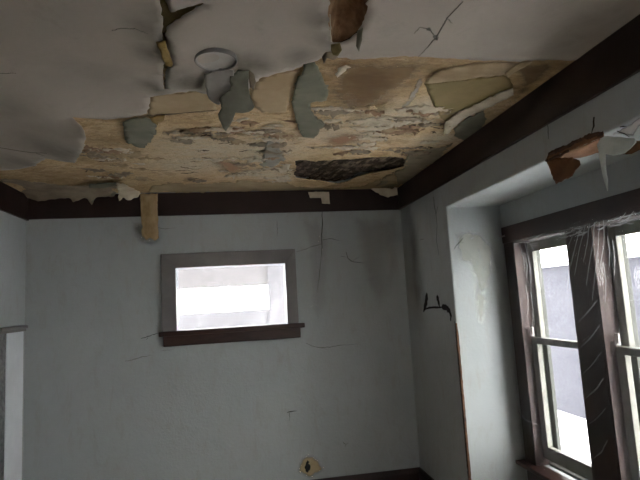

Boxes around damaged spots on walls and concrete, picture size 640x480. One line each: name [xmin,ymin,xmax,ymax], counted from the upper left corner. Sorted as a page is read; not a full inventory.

crack [415,1,464,57]
flaking render [0,56,575,193]
water stain [335,66,416,114]
flaking render [545,119,640,191]